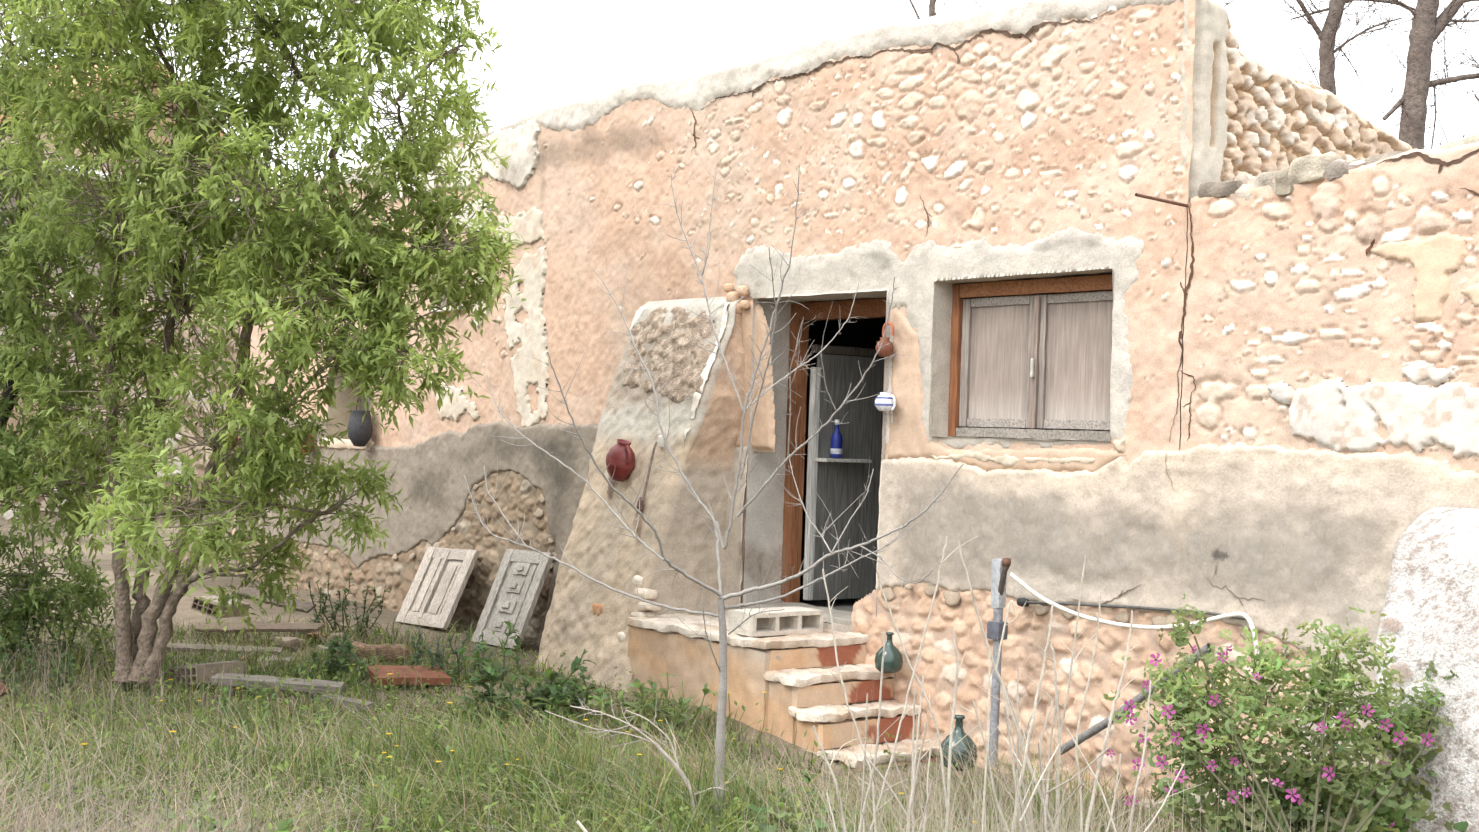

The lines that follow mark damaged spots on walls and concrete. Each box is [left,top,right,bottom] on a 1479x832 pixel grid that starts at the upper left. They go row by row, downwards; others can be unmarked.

crack [689,10,1112,151]
crack [1376,148,1479,196]
peeling [386,119,549,427]
spalling [622,283,750,449]
crack [1165,199,1196,491]
peeling [1268,360,1479,458]
spalling [162,471,557,642]